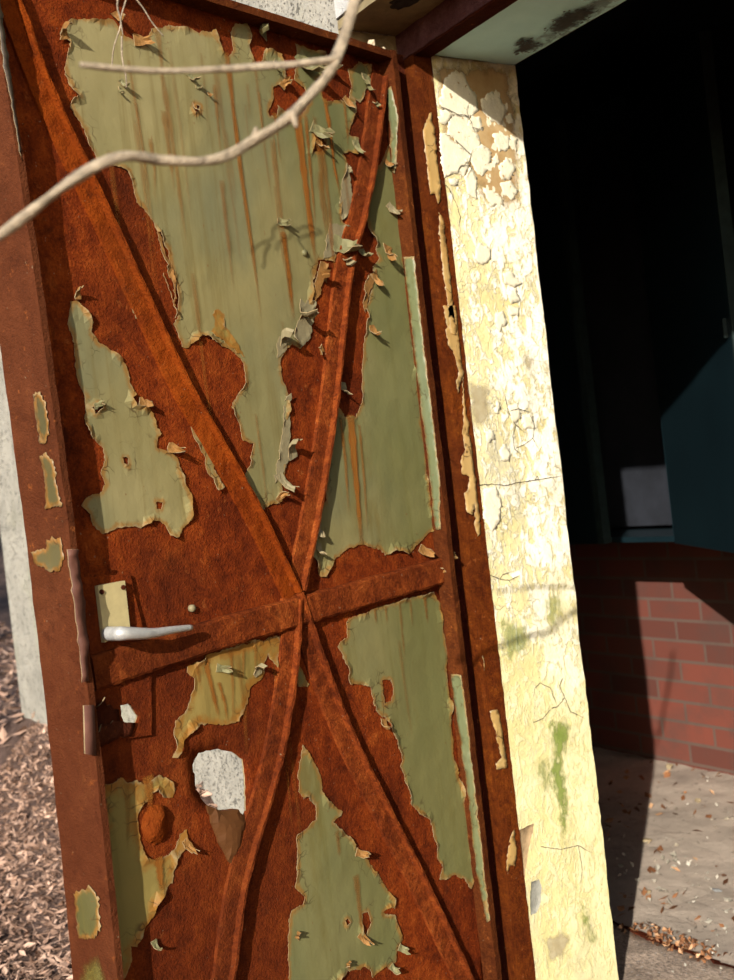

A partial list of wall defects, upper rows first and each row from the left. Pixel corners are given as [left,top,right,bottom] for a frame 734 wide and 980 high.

peeling [60,11,441,577]
peeling [423,70,523,536]
peeling [494,400,535,430]
peeling [288,745,411,980]
peeling [338,592,490,922]